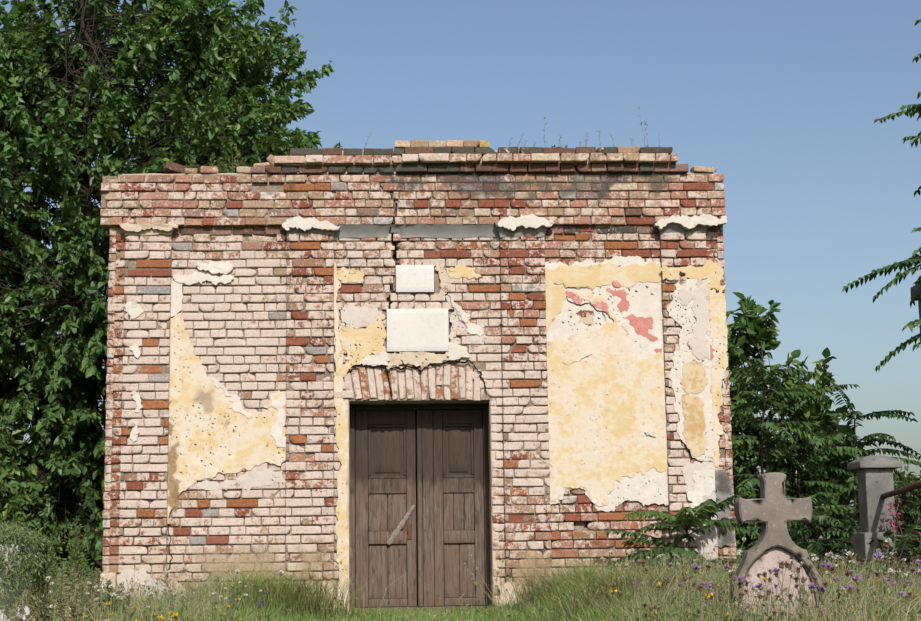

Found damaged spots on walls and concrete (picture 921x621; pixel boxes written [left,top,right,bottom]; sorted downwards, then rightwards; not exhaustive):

crack [379,184,400,265]
peeling [125,301,144,319]
peeling [445,265,482,280]
peeling [457,308,484,337]
peeling [130,391,143,442]
peeling [167,261,286,524]
peeling [333,262,470,603]
peeling [544,256,728,512]